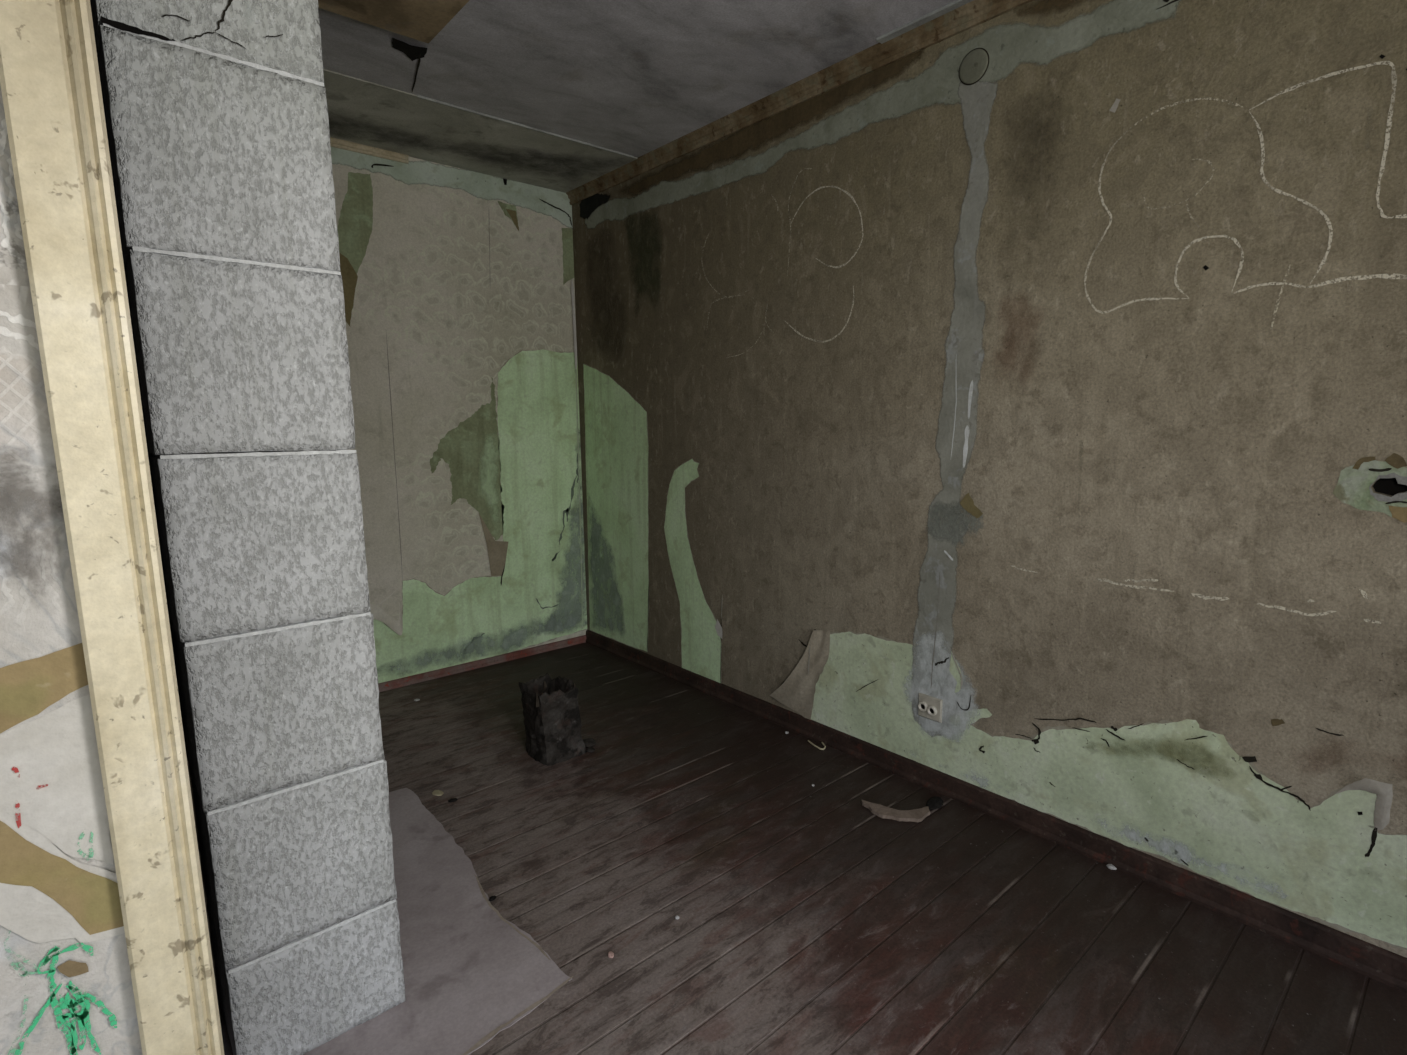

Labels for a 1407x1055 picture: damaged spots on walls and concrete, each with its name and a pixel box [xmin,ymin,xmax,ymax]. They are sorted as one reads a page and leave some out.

crack [162,0,283,50]
damp [390,445,623,671]
peeling [331,0,1181,683]
spalling [1333,453,1407,523]
peeling [0,643,125,943]
peeling [811,631,1407,950]